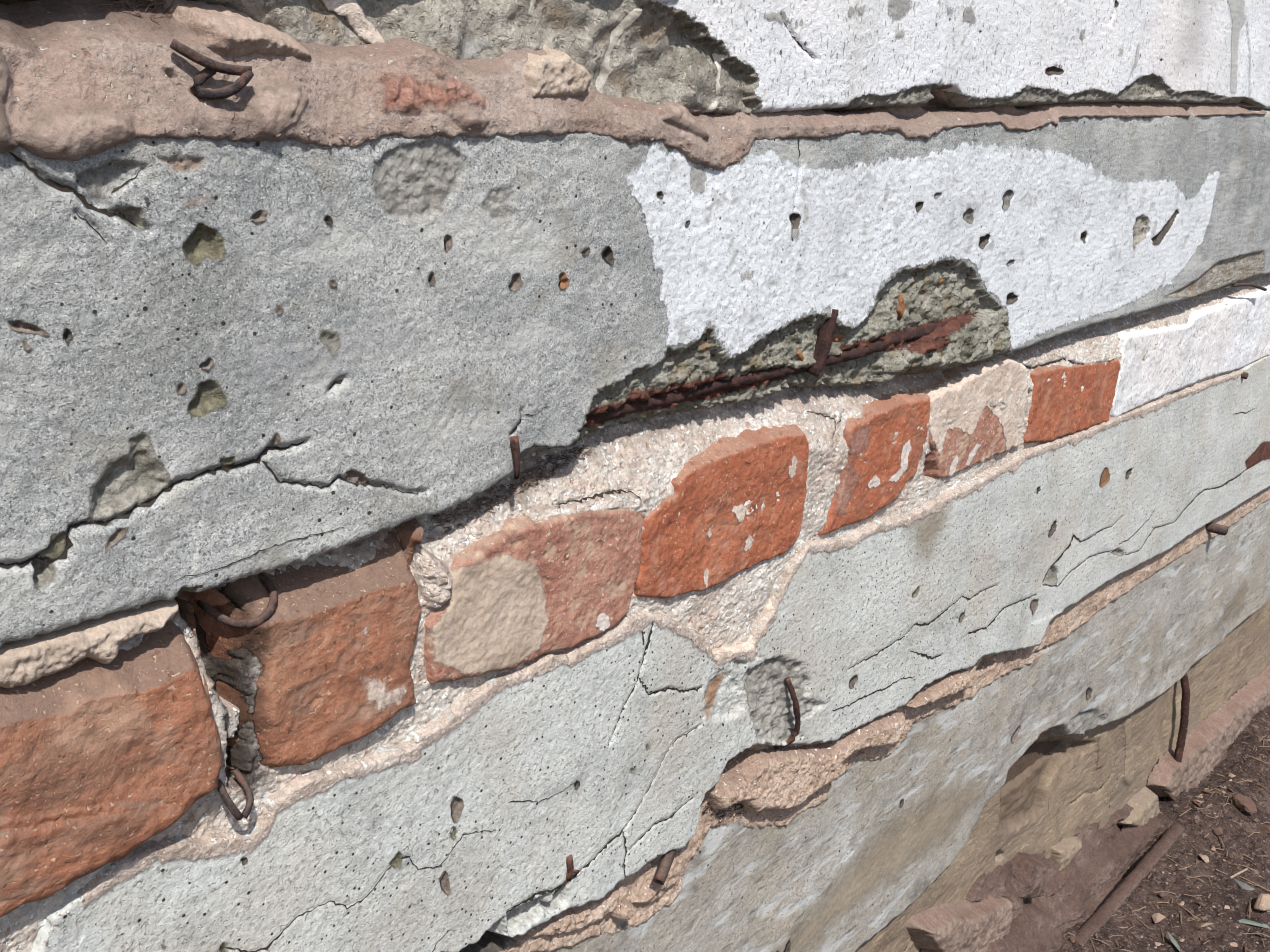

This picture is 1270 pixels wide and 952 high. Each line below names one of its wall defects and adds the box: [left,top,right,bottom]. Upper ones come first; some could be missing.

peeling [888,0,912,38]
peeling [947,4,975,24]
spalling [828,74,1265,112]
peeling [520,141,1265,462]
rust [833,293,976,354]
rust [583,349,804,428]
crack [0,441,428,569]
crack [832,460,1260,711]
crack [610,615,702,741]
crack [509,724,701,911]
spalling [999,710,1102,822]
crack [217,830,494,952]